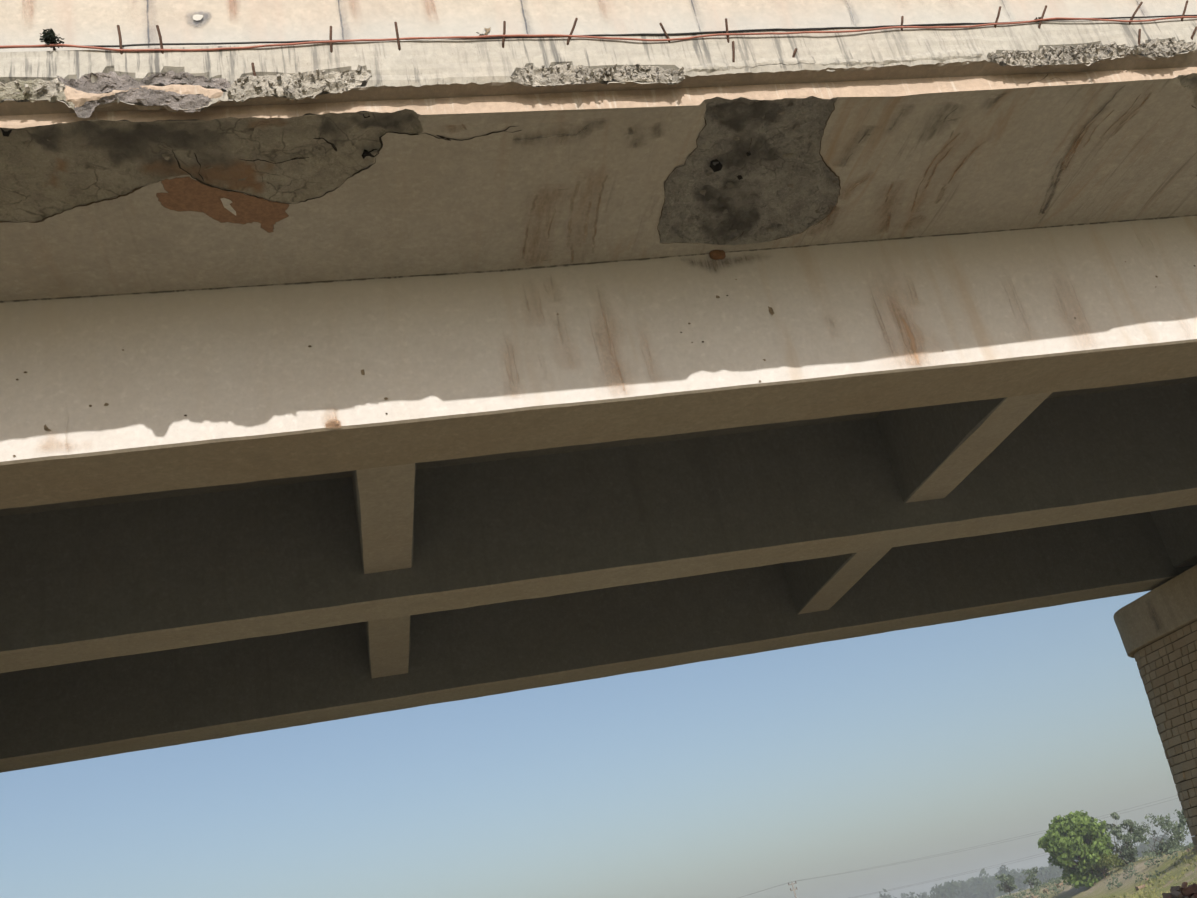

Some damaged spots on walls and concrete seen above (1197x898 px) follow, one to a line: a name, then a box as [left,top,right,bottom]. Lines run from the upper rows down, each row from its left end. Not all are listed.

spalling [510,63,685,87]
spalling [725,18,735,62]
spalling [818,0,1197,72]
spalling [1178,74,1197,106]
spalling [0,62,423,233]
spalling [658,96,840,245]